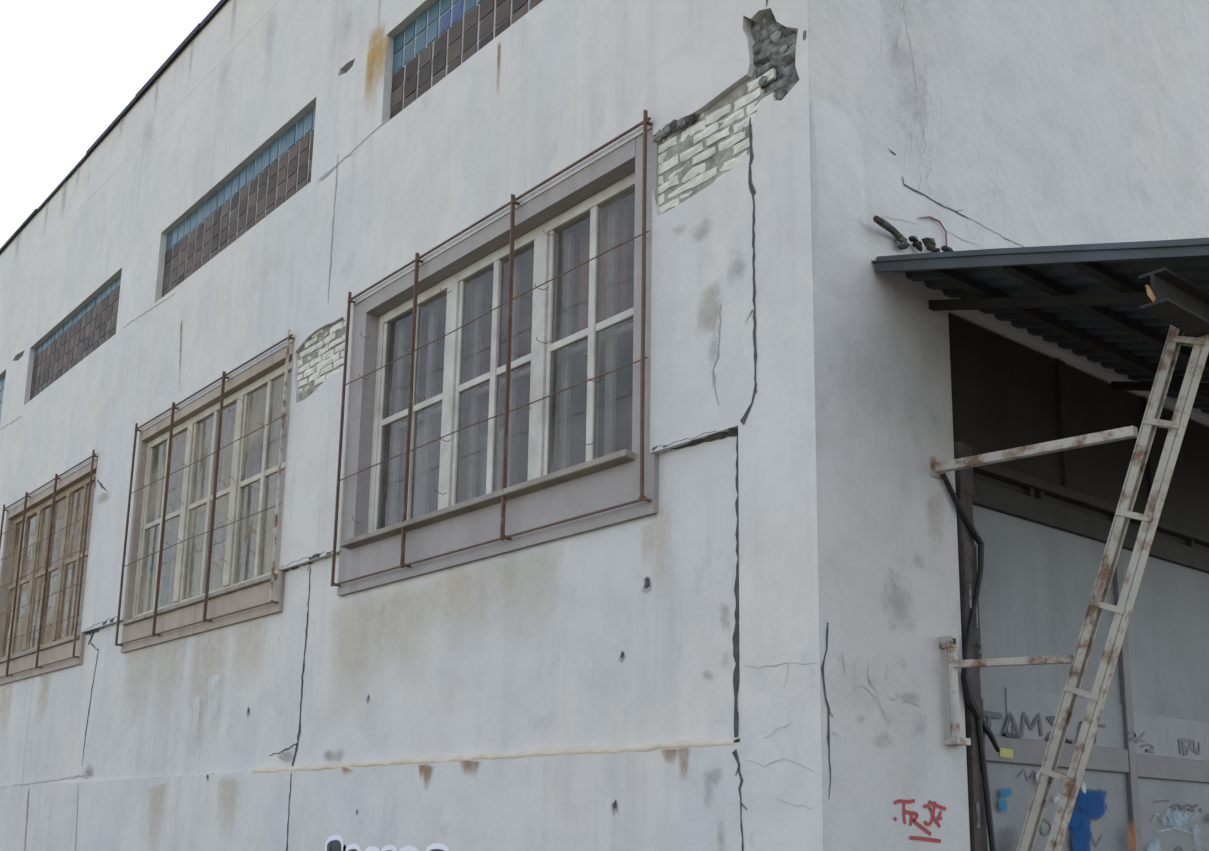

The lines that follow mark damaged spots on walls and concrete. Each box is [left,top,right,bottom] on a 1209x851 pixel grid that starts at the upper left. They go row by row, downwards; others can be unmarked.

rust [367,31,387,75]
flaking render [653,10,806,214]
crack [880,0,1023,247]
flaking render [297,319,346,402]
crack [712,117,757,425]
crack [1,617,123,851]
crack [270,567,311,851]
crack [732,623,918,851]